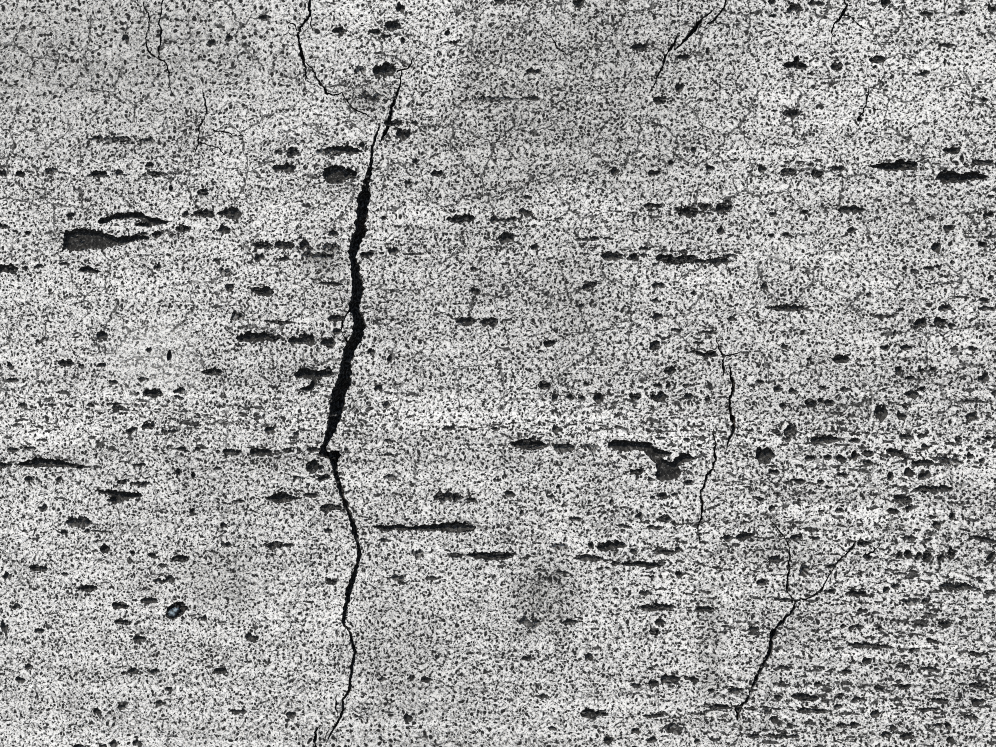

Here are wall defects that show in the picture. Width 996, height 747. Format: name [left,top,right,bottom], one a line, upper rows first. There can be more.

crack [649,0,727,93]
crack [284,0,419,747]
crack [697,336,740,547]
crack [734,520,881,720]